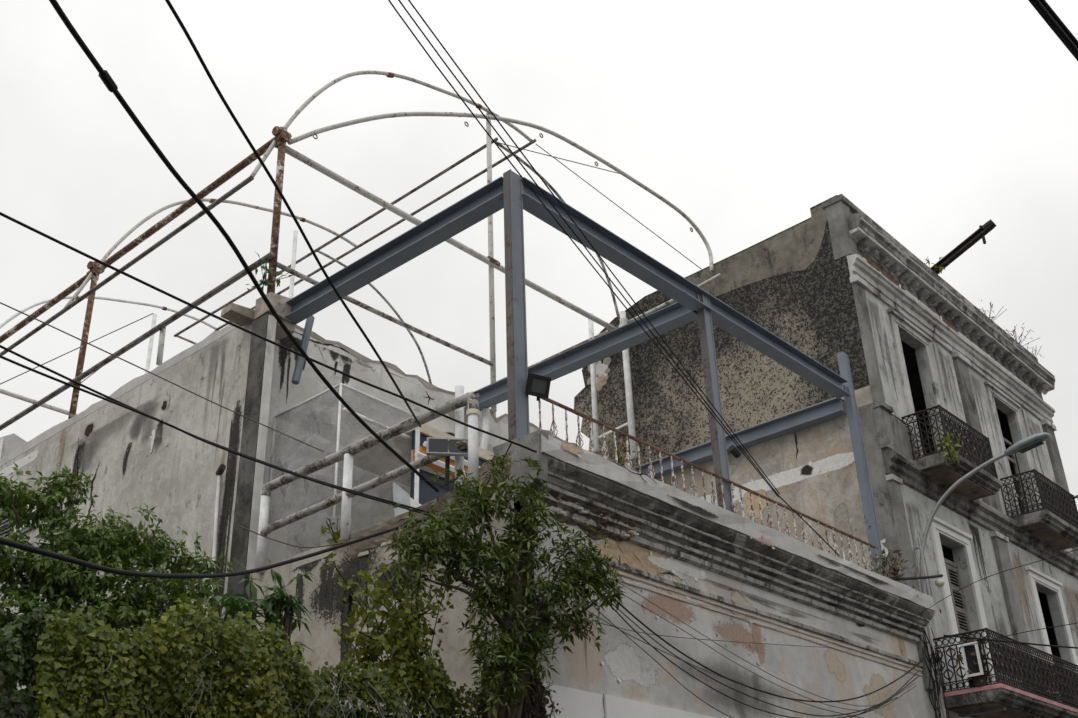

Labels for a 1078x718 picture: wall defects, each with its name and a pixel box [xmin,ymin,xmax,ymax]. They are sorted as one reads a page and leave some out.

water stain [66,418,120,521]
water stain [122,404,152,475]
peeling [587,530,707,630]
peeling [716,590,767,665]